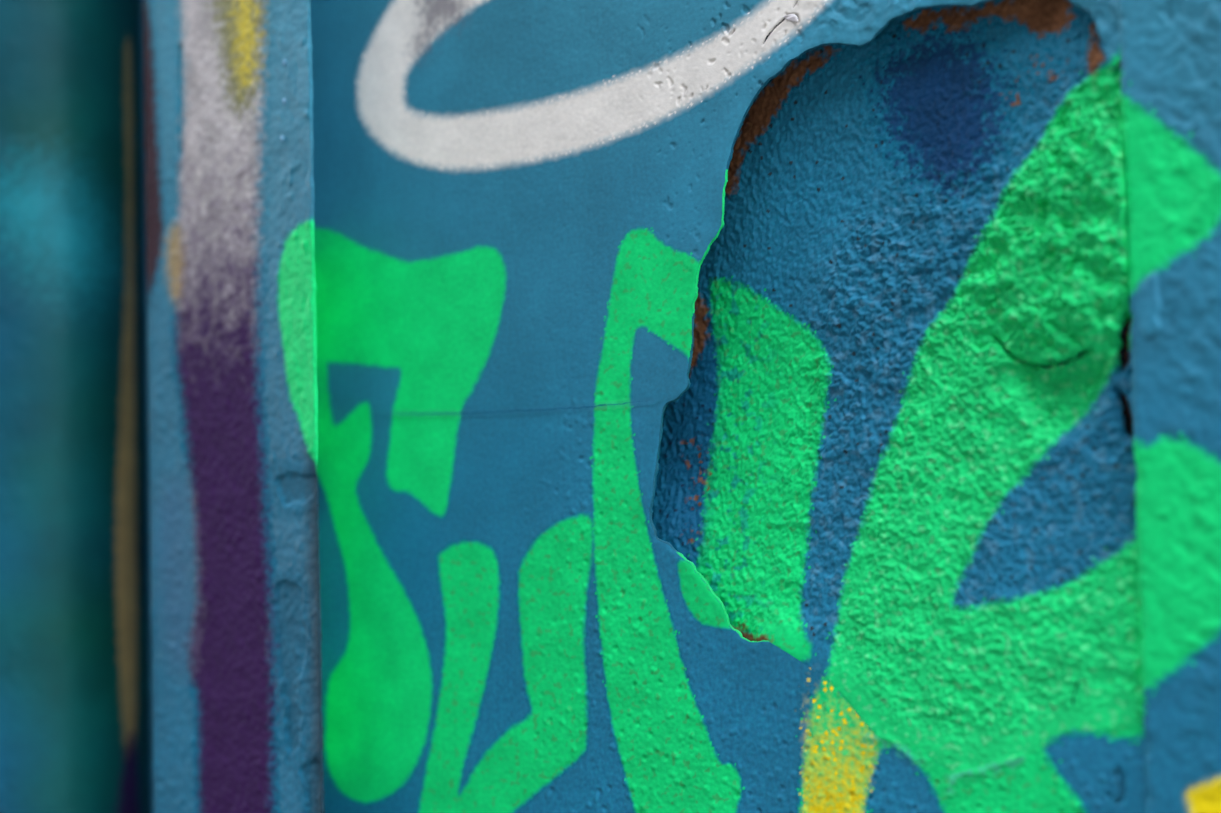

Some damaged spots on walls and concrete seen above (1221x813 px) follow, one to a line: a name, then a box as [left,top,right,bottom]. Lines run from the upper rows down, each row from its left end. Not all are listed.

crack [764,0,798,43]
crack [1001,341,1090,369]
spalling [649,0,1165,772]